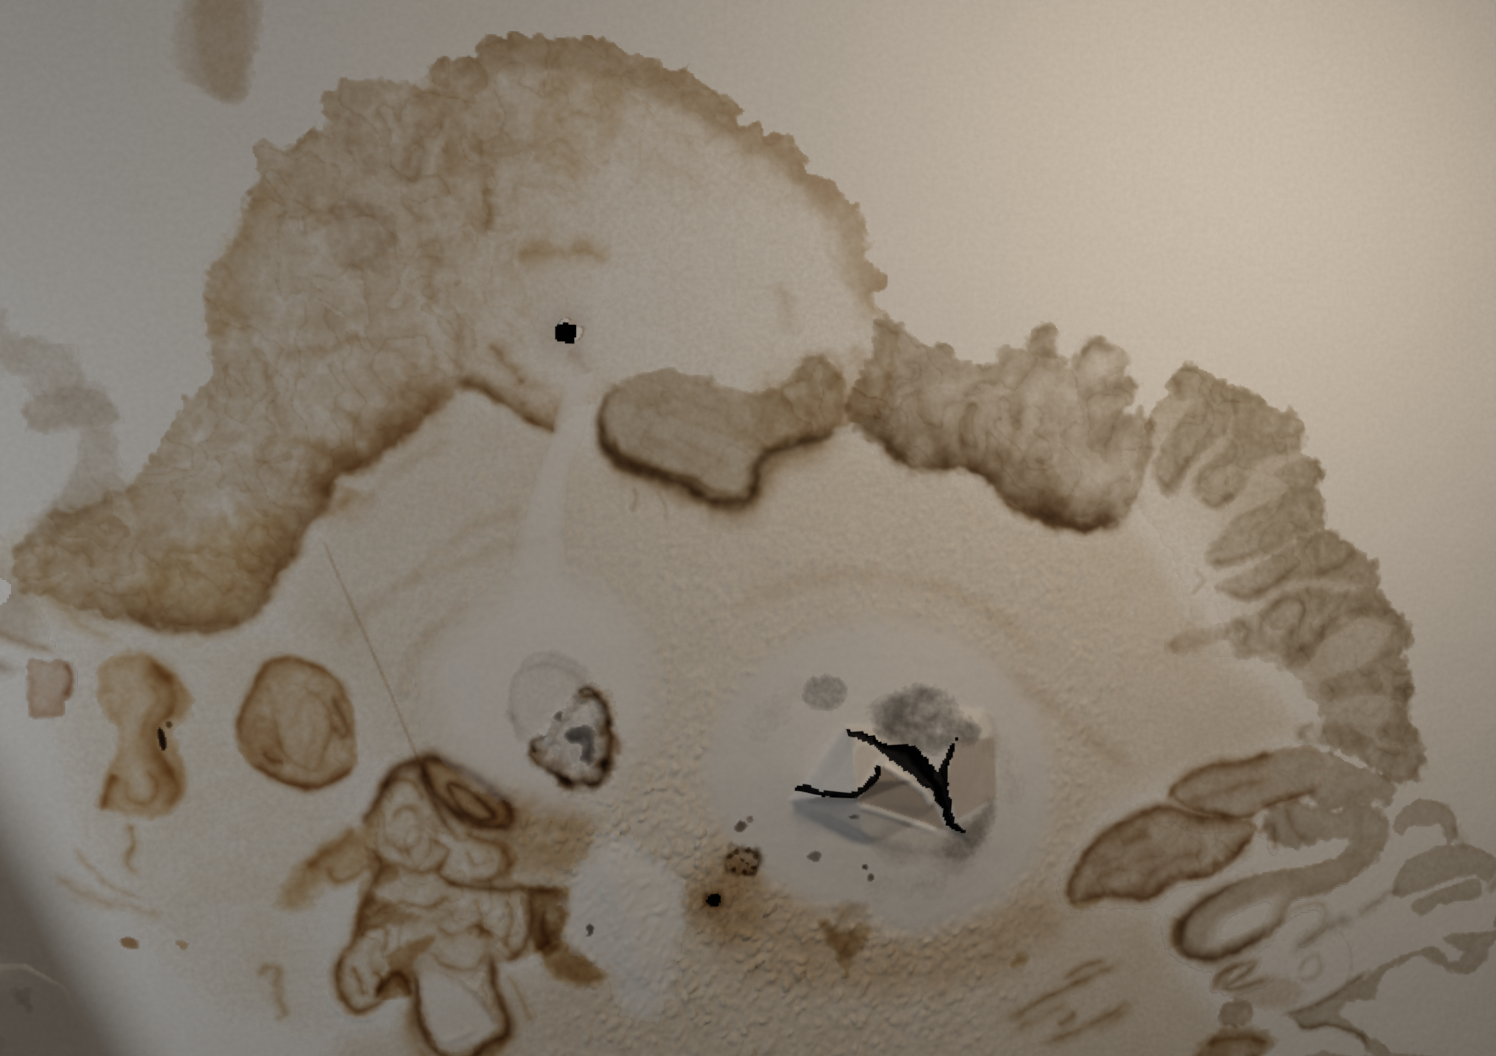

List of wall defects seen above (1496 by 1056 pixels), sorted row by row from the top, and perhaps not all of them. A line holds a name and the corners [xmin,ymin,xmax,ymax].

leakage [169,0,264,107]
leakage [0,31,891,1056]
spalling [523,679,628,802]
crack [795,729,966,833]
leakage [506,313,1496,1056]